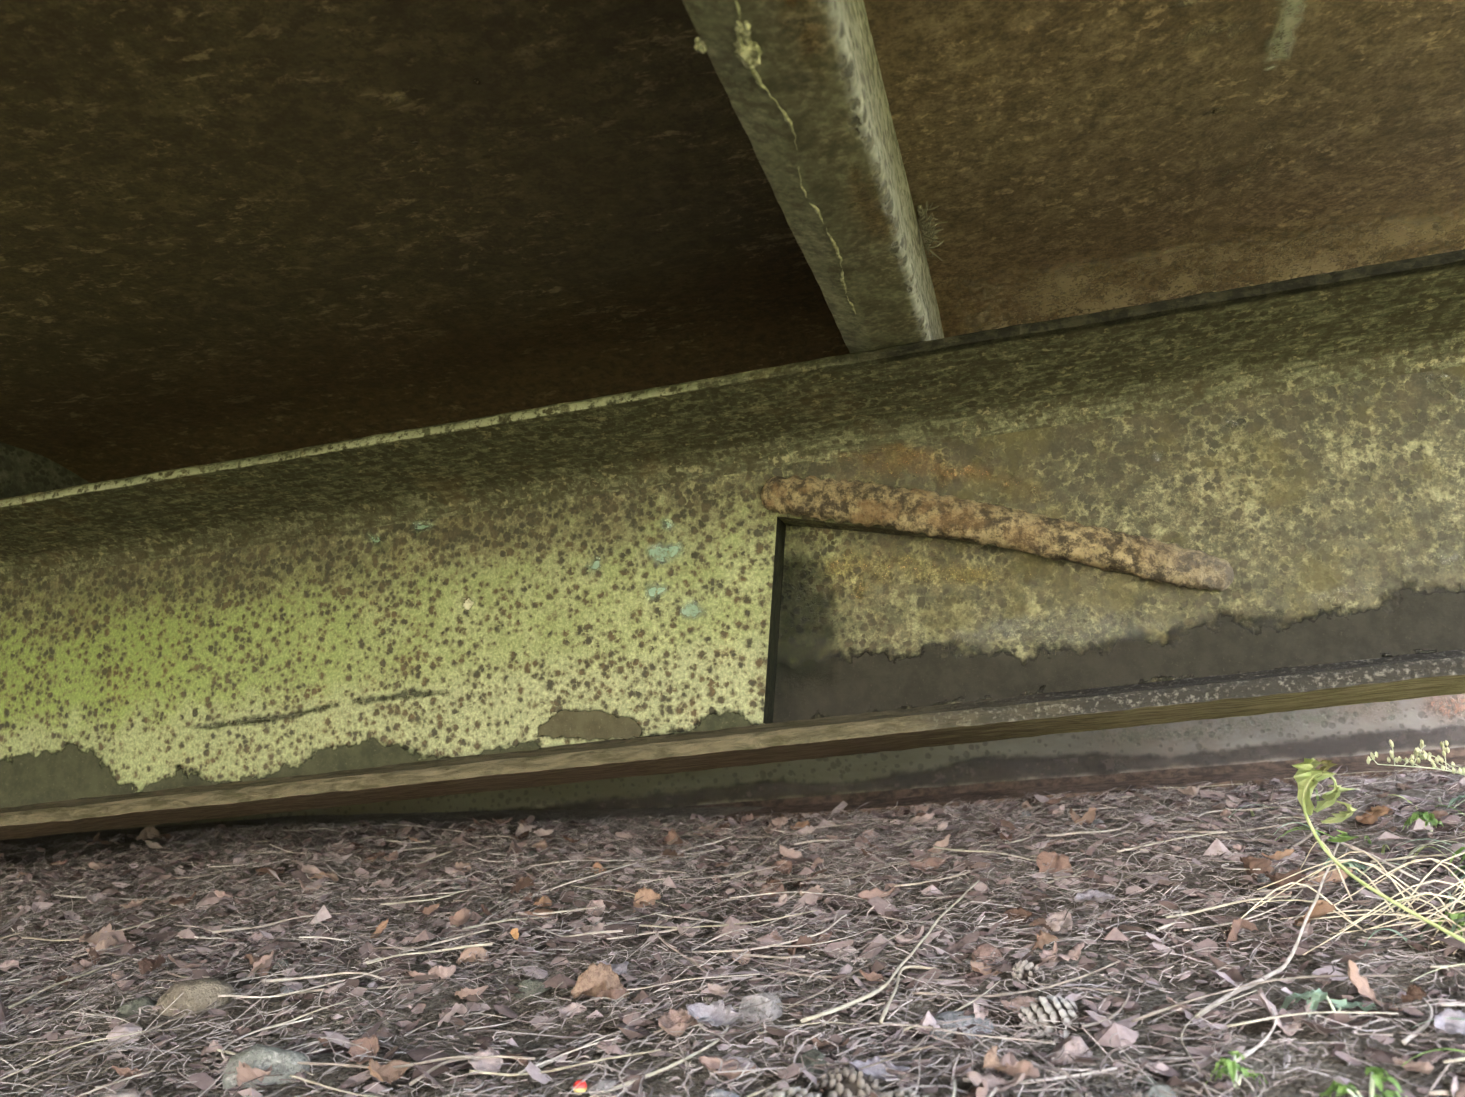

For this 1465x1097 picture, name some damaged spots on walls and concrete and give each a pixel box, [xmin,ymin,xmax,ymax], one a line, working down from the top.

damp [1266,0,1305,70]
damp [773,582,1465,723]